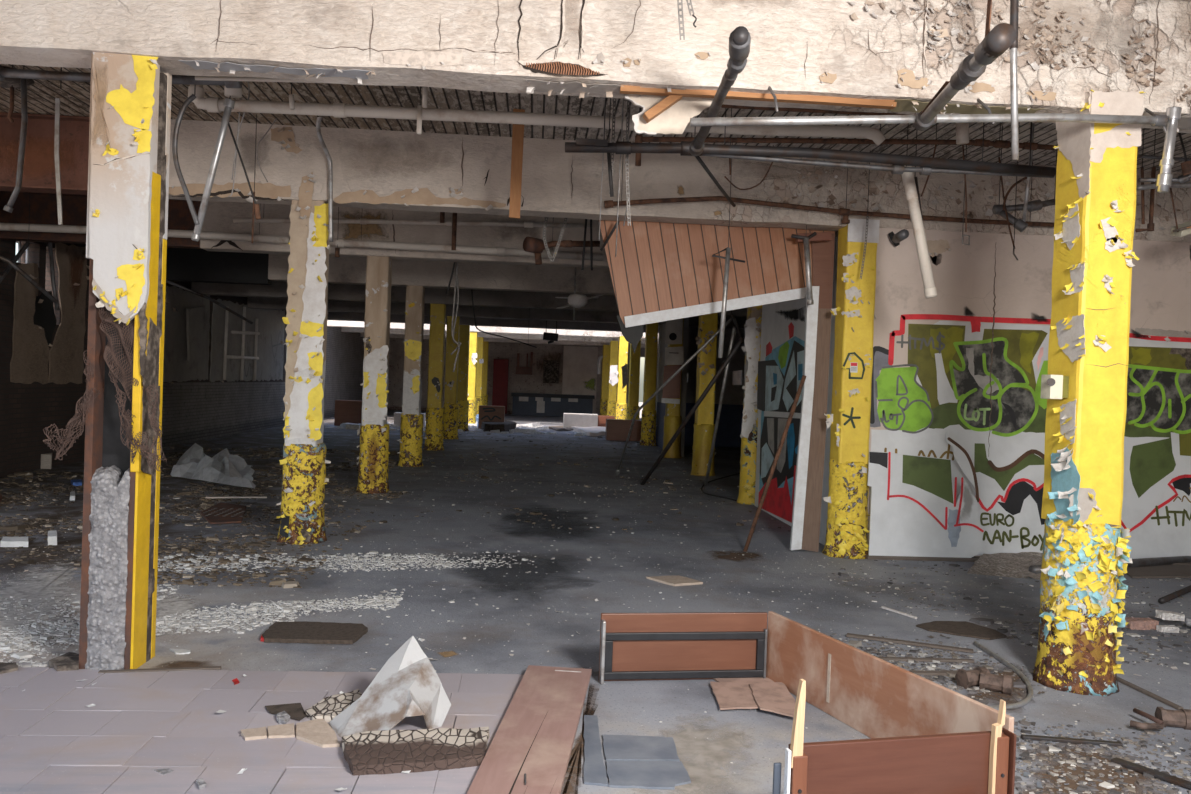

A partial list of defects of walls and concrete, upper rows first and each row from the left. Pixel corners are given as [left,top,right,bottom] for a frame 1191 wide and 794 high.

crack [212,0,248,49]
crack [311,0,588,65]
crack [865,0,928,78]
crack [1149,2,1159,101]
peeling [74,254,136,325]
peeling [282,172,330,442]
peeling [830,253,877,332]
peeling [1051,314,1112,365]
peeling [357,338,454,465]
peeling [824,388,860,447]
peeling [277,458,329,545]
peeling [1039,399,1133,686]